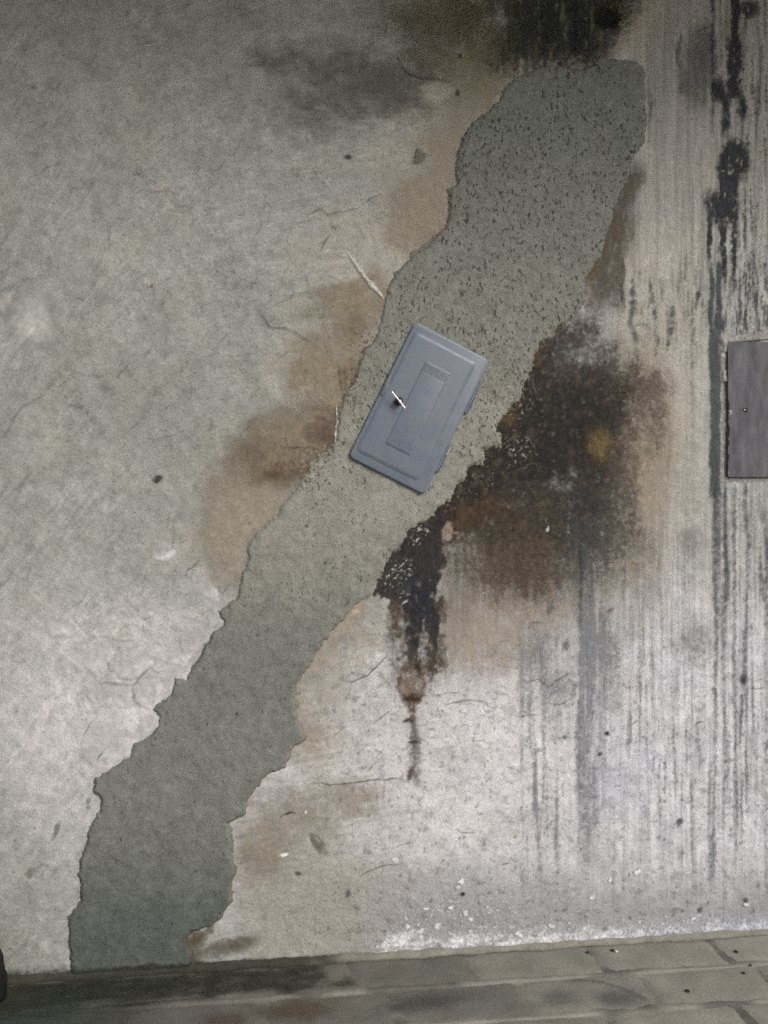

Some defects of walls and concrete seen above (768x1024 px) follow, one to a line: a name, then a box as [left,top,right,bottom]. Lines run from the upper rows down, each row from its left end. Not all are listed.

peeling [58,616,220,767]
peeling [152,546,177,561]
leakage [206,275,386,581]
peeling [441,521,458,542]
leakage [373,317,672,839]
leakage [676,0,768,817]